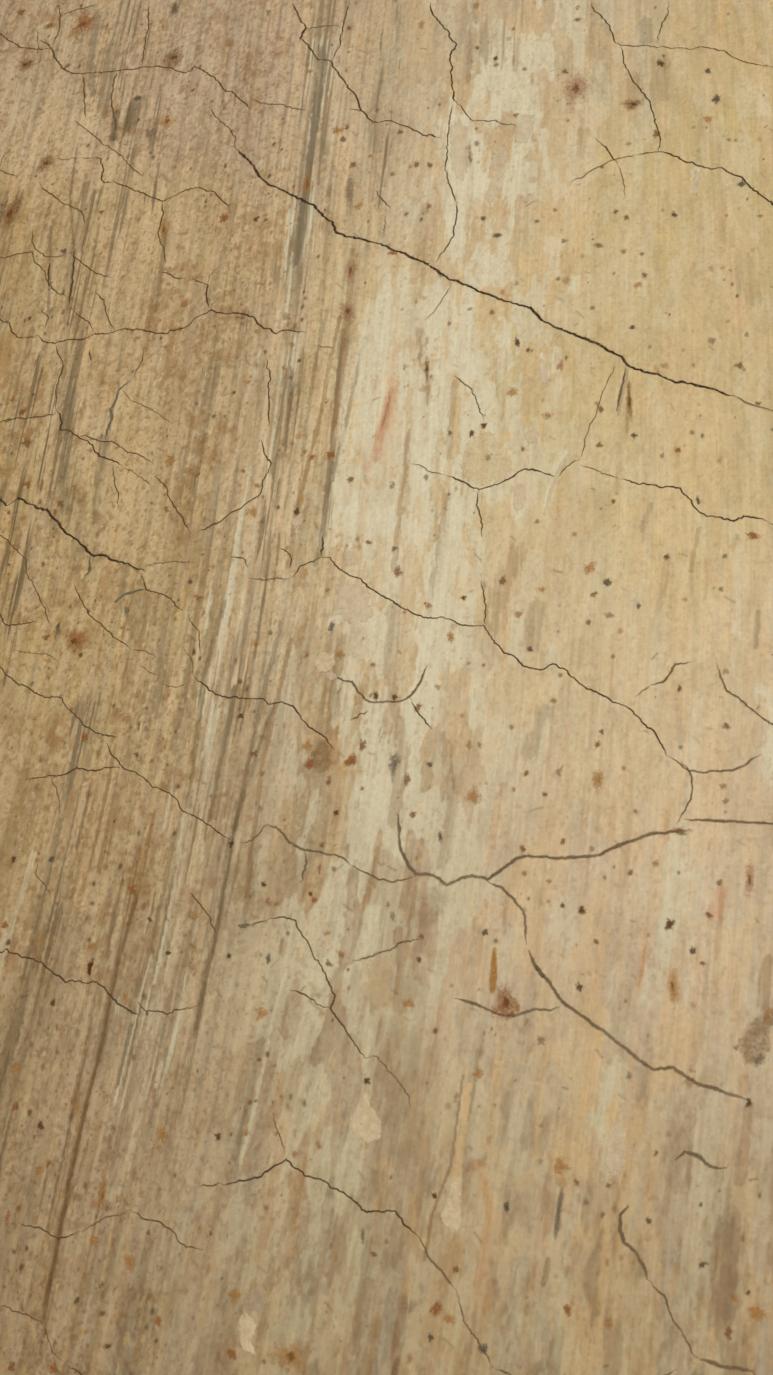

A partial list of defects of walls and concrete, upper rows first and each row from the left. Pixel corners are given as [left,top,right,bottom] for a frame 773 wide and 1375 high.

crack [0,2,773,1100]
crack [3,1305,82,1375]
crack [20,1212,198,1249]
crack [199,1119,511,1375]
crack [618,1207,755,1375]
crack [676,1151,725,1169]